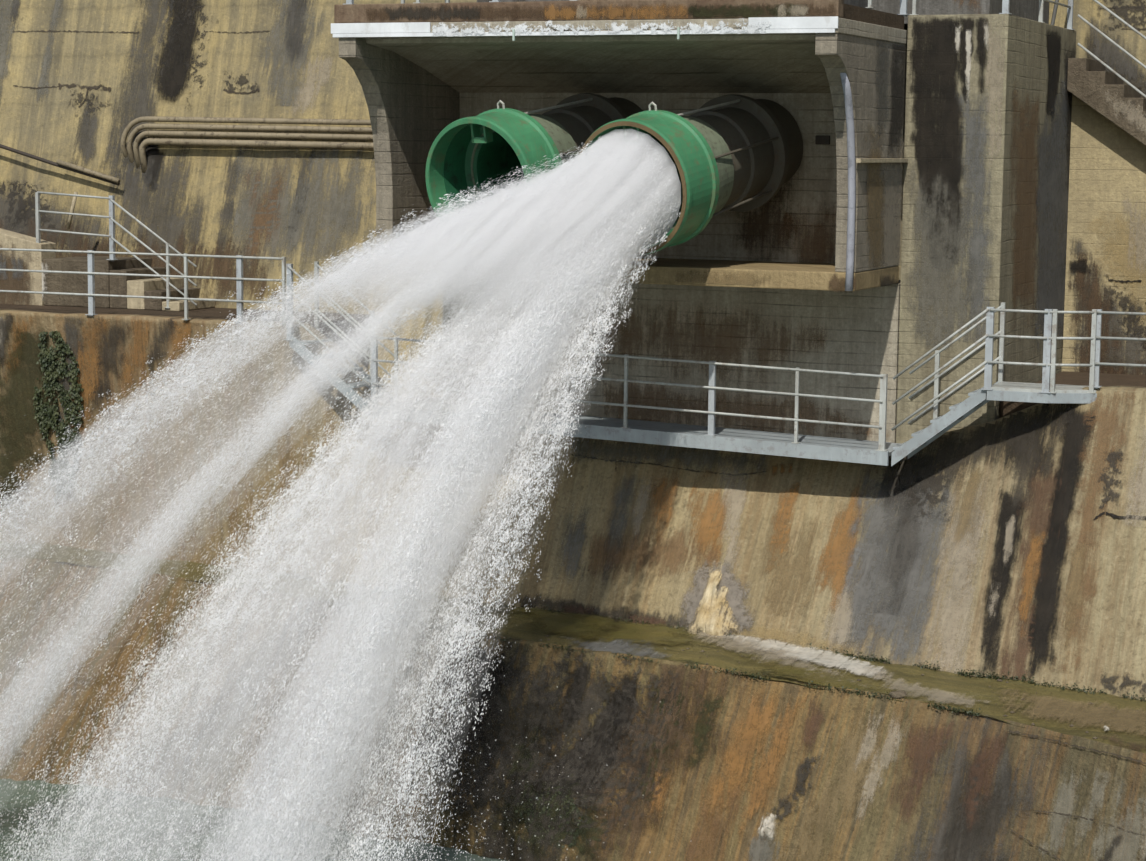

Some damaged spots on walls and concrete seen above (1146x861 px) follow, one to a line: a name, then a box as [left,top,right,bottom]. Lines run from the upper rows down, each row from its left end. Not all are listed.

damp [0,0,375,369]
damp [867,17,1005,347]
damp [92,322,130,410]
damp [698,404,1095,704]
crack [1094,512,1146,520]